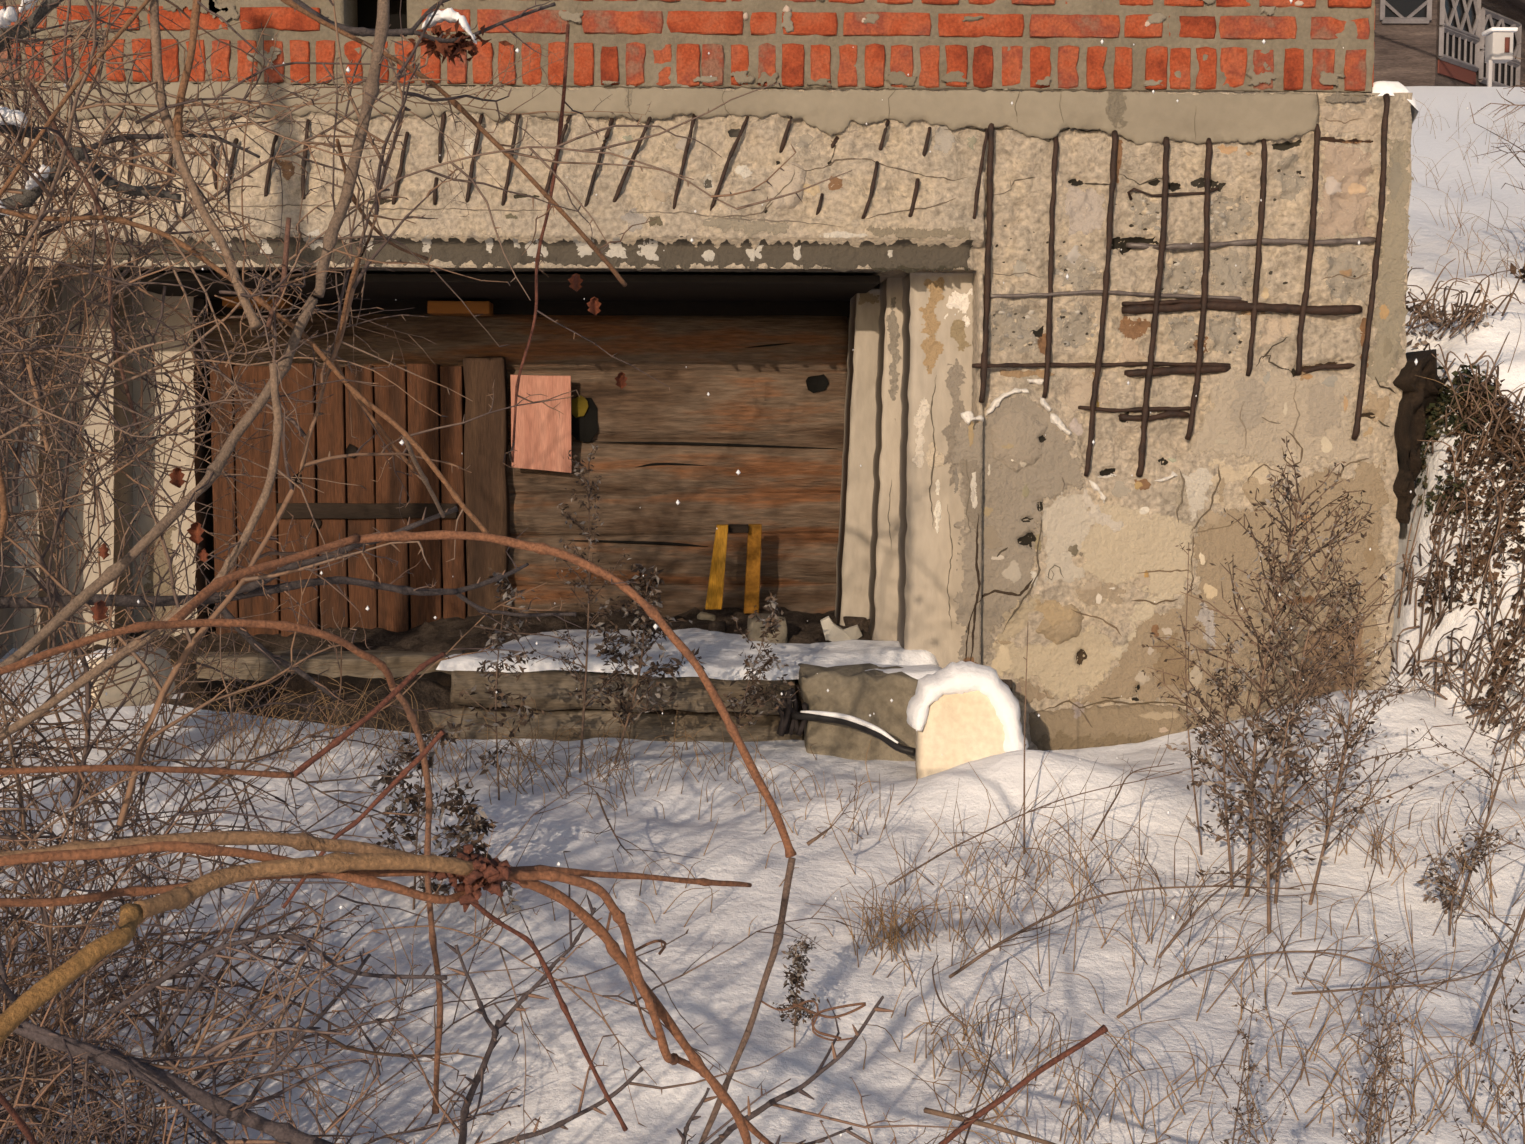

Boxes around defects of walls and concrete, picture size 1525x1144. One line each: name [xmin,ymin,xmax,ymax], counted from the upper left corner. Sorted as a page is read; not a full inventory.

corrosion [828,176,843,190]
corrosion [1217,144,1253,156]
spalling [1277,105,1379,240]
peeling [512,238,548,258]
peeling [573,237,659,261]
spalling [1027,177,1255,295]
peeling [944,289,973,327]
corrosion [1118,315,1151,340]
corrosion [1000,333,1055,378]
spalling [961,375,1129,443]
peeling [1154,448,1298,526]
peeling [991,468,1124,677]